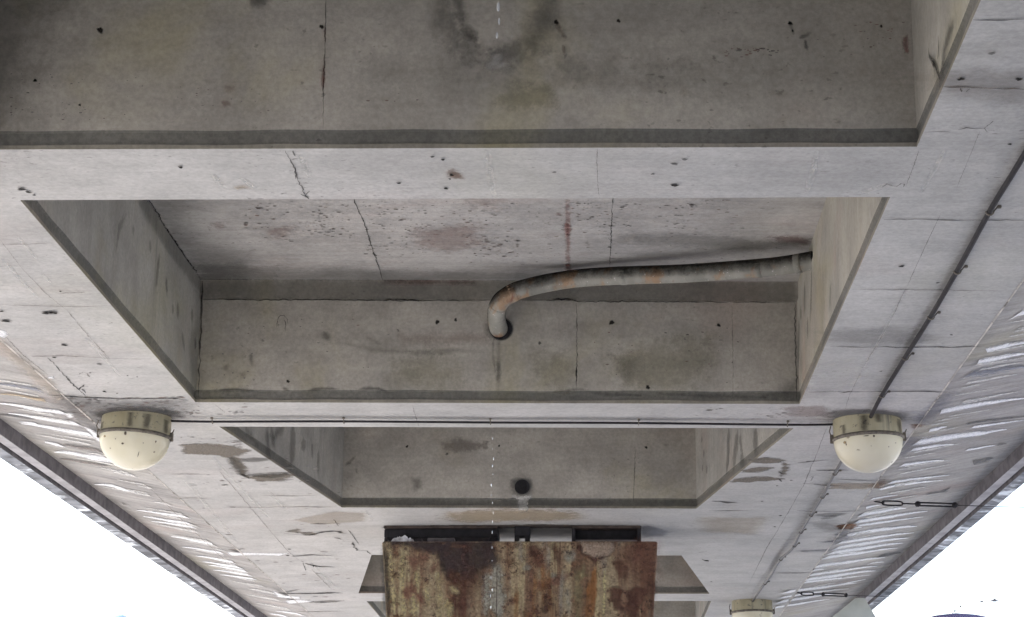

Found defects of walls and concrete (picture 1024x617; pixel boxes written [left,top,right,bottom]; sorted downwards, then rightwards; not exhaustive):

crack [285,151,309,199]
crack [48,200,482,400]
corrosion [382,539,655,617]